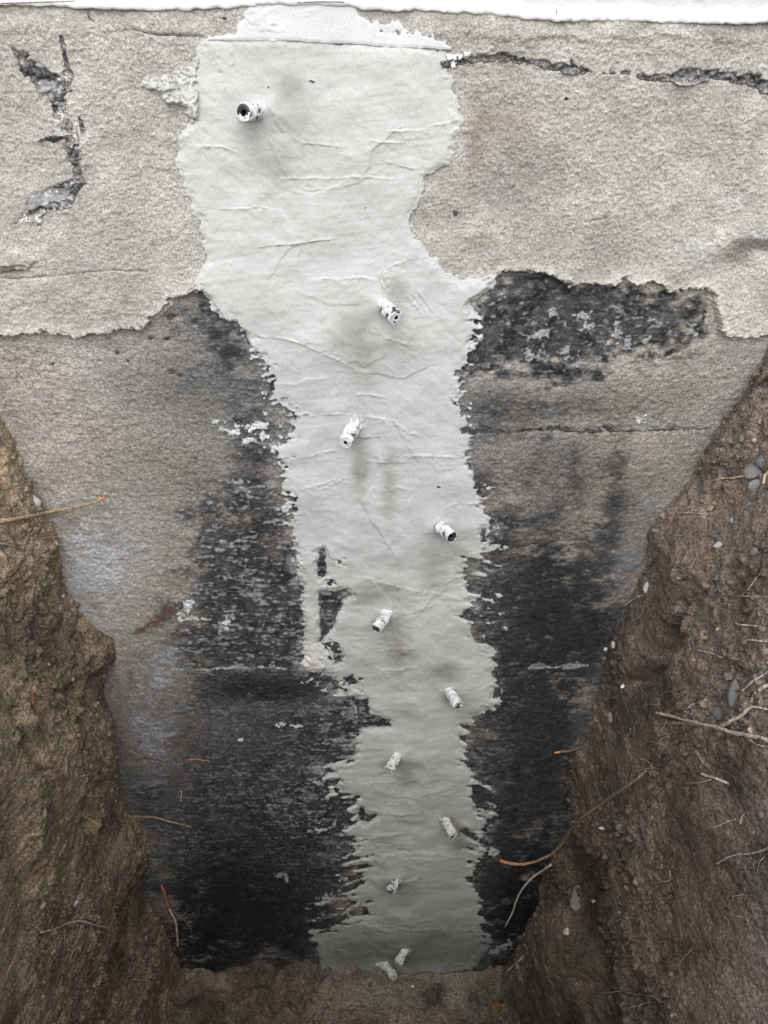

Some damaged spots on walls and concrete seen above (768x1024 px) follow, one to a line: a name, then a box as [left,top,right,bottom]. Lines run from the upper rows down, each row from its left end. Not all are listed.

crack [440,51,768,95]
peeling [486,264,768,377]
efflorescence [62,503,155,623]
water stain [131,647,315,704]
water stain [503,542,617,792]
water stain [488,811,559,964]